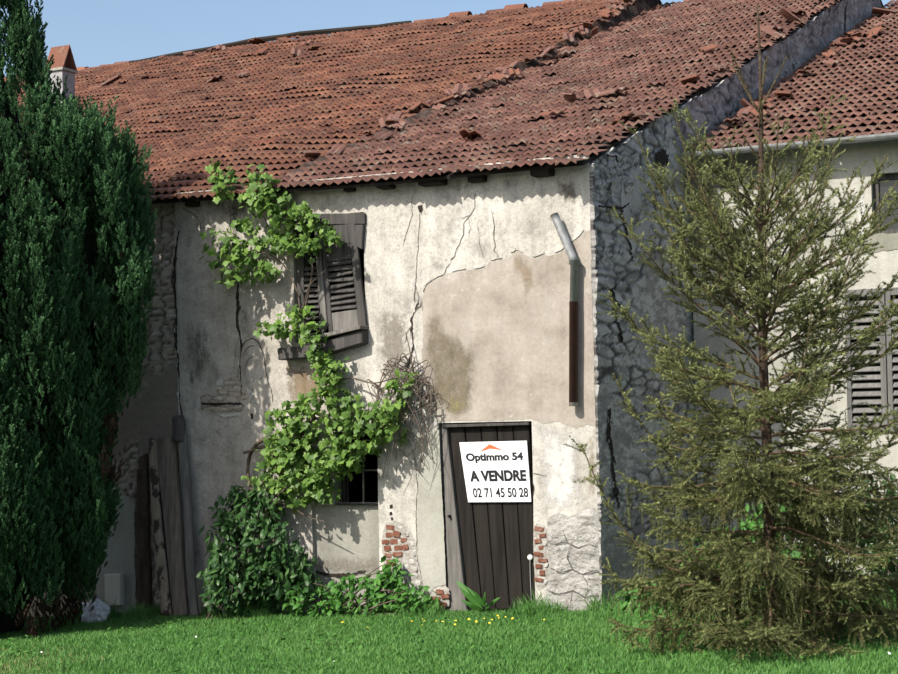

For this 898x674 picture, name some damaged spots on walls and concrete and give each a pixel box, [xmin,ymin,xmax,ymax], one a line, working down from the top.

crack [444,193,499,274]
crack [171,207,241,415]
crack [235,282,247,394]
crack [403,201,421,380]
flaking render [421,229,596,429]
spalling [196,377,254,419]
crack [607,408,621,508]
spalling [382,504,422,592]
spalling [432,585,450,611]
spalling [533,507,603,612]